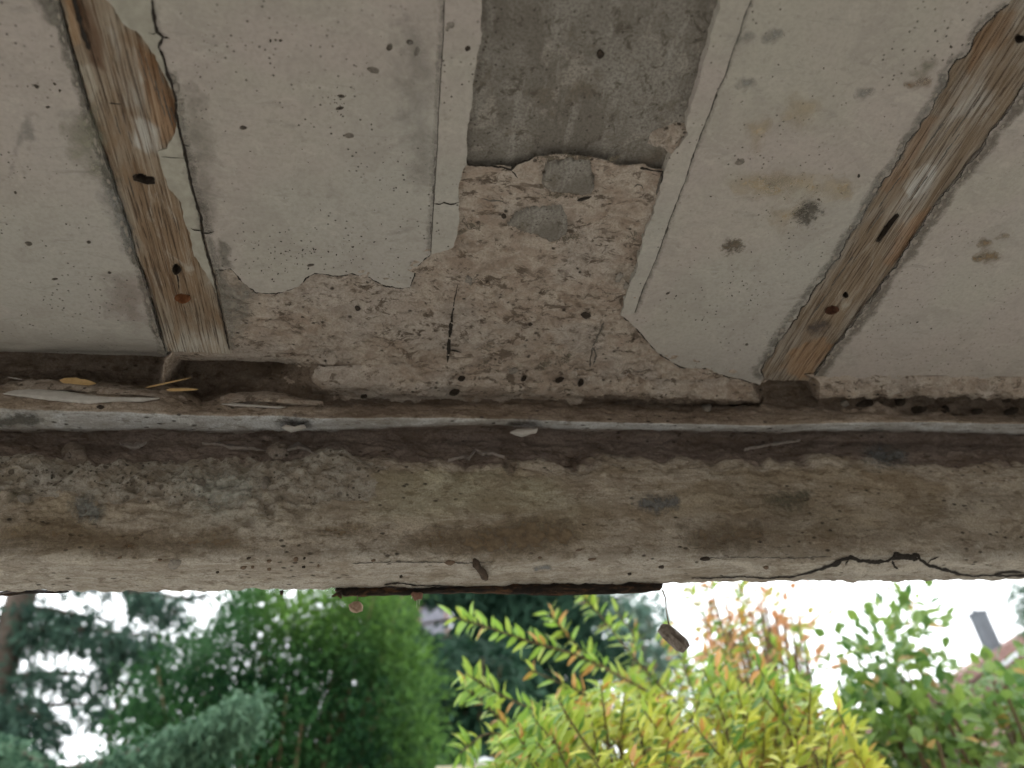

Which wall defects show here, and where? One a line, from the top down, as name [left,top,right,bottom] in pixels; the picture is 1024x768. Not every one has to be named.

crack [150,1,506,349]
spalling [174,153,743,381]
damp [722,239,742,253]
damp [793,200,824,225]
crack [446,284,461,363]
crack [696,551,1024,579]